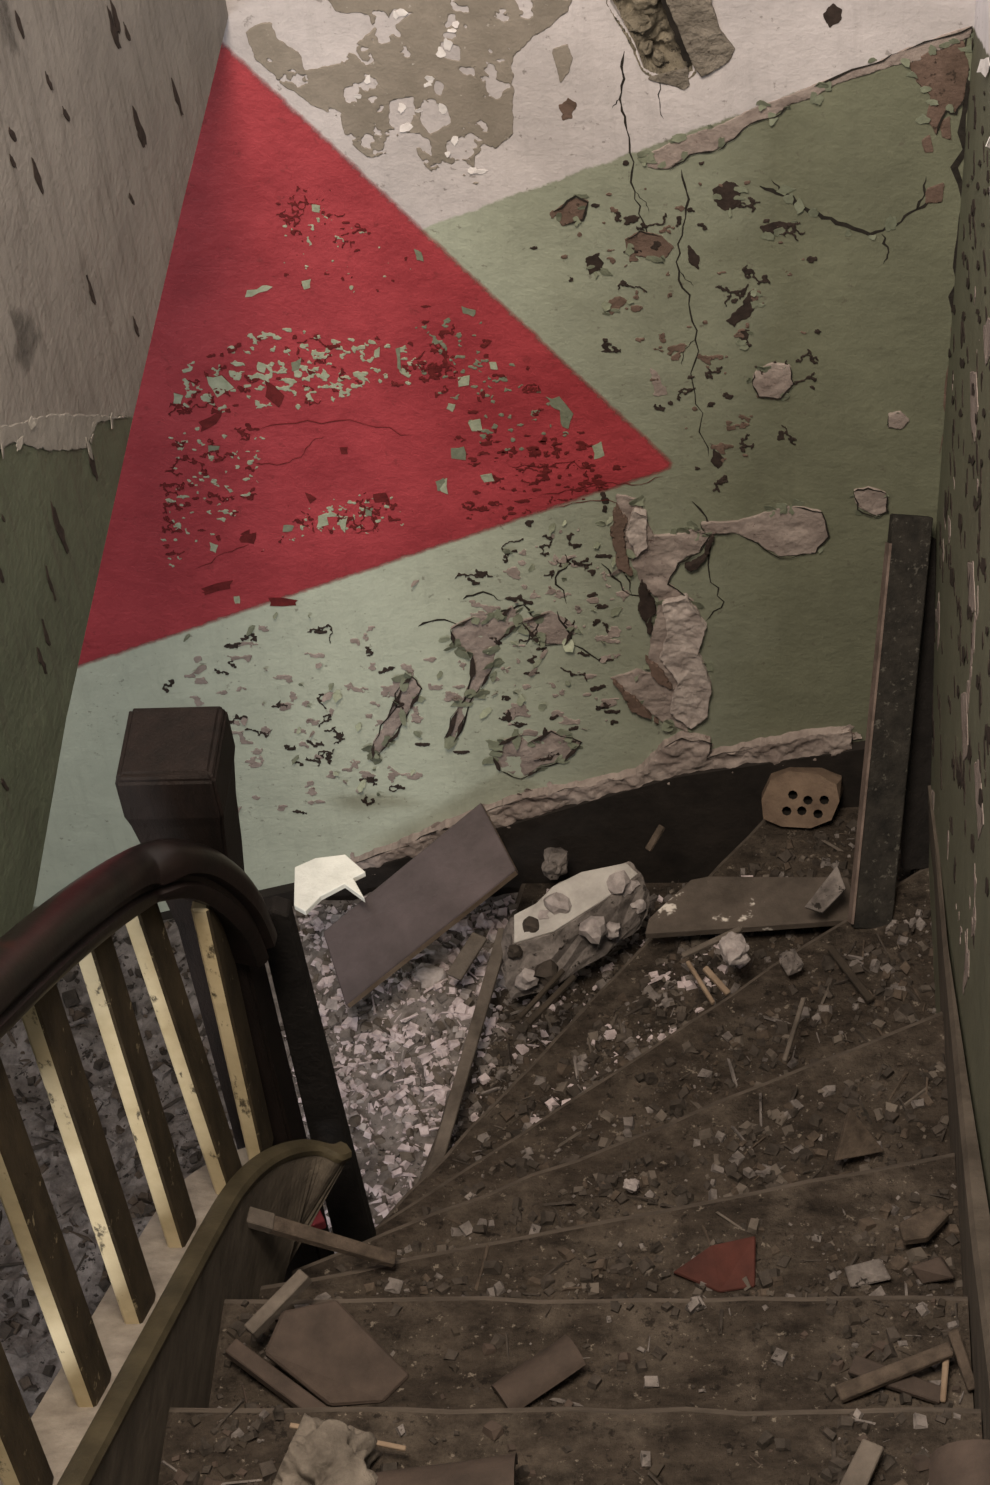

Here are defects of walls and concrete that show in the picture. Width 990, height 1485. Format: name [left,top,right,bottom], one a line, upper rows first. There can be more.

peeling [107,0,131,49]
peeling [246,0,572,185]
peeling [552,44,577,121]
spalling [606,0,735,90]
peeling [8,127,44,194]
crack [760,39,970,308]
peeling [245,186,380,297]
peeling [550,193,707,315]
crack [612,51,709,456]
peeling [0,413,128,481]
peeling [601,26,990,995]
spalling [160,305,862,875]